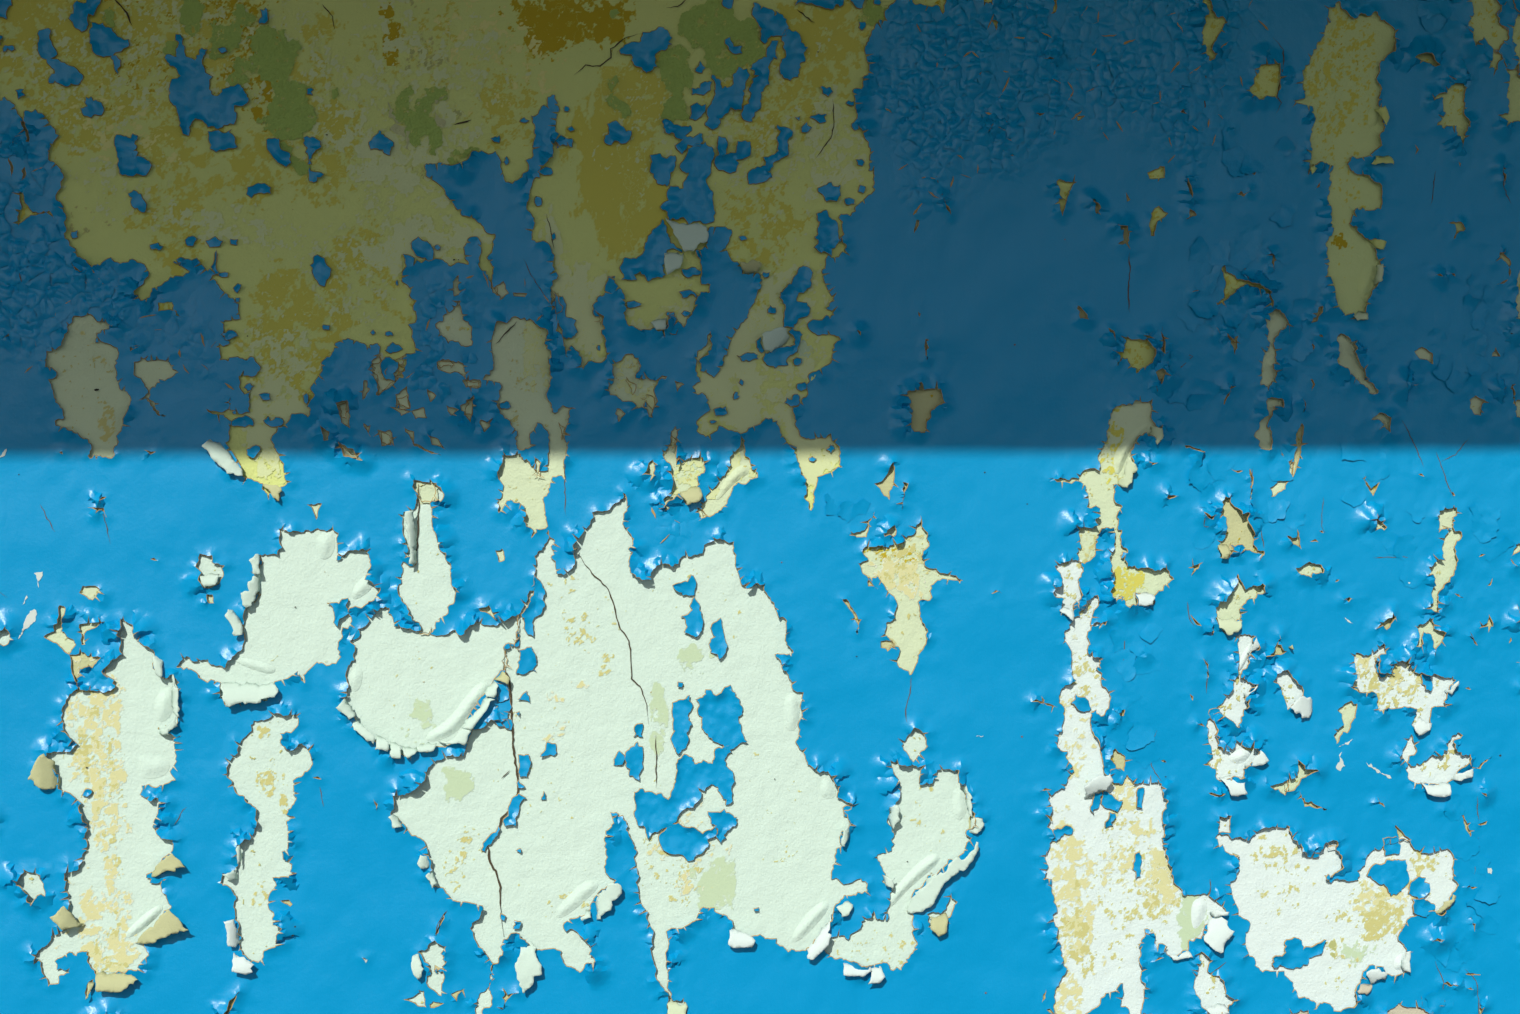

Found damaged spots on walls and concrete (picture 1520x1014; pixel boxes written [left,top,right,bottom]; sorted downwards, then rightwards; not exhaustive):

peeling [1147,166,1165,181]
peeling [1055,176,1076,216]
peeling [1118,224,1132,248]
peeling [1149,206,1168,236]
peeling [1449,221,1466,239]
peeling [1188,0,1400,582]
peeling [1497,250,1520,319]
peeling [0,0,984,1014]
peeling [1032,328,1501,1014]